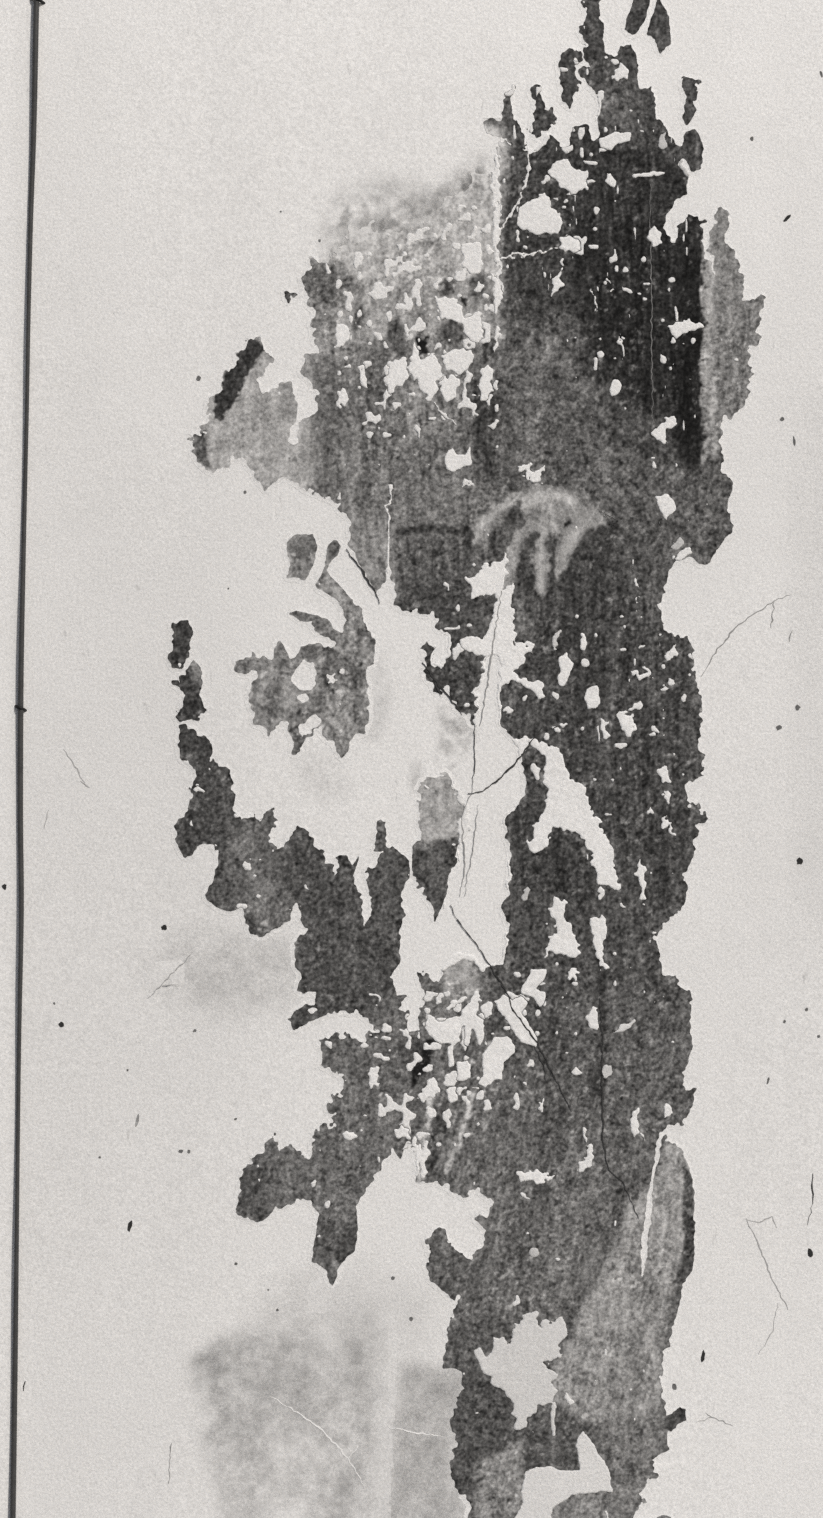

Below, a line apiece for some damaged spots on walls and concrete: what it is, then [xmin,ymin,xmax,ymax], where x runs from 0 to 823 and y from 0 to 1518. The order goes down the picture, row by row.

peeling [164,0,769,1518]
crack [701,595,793,677]